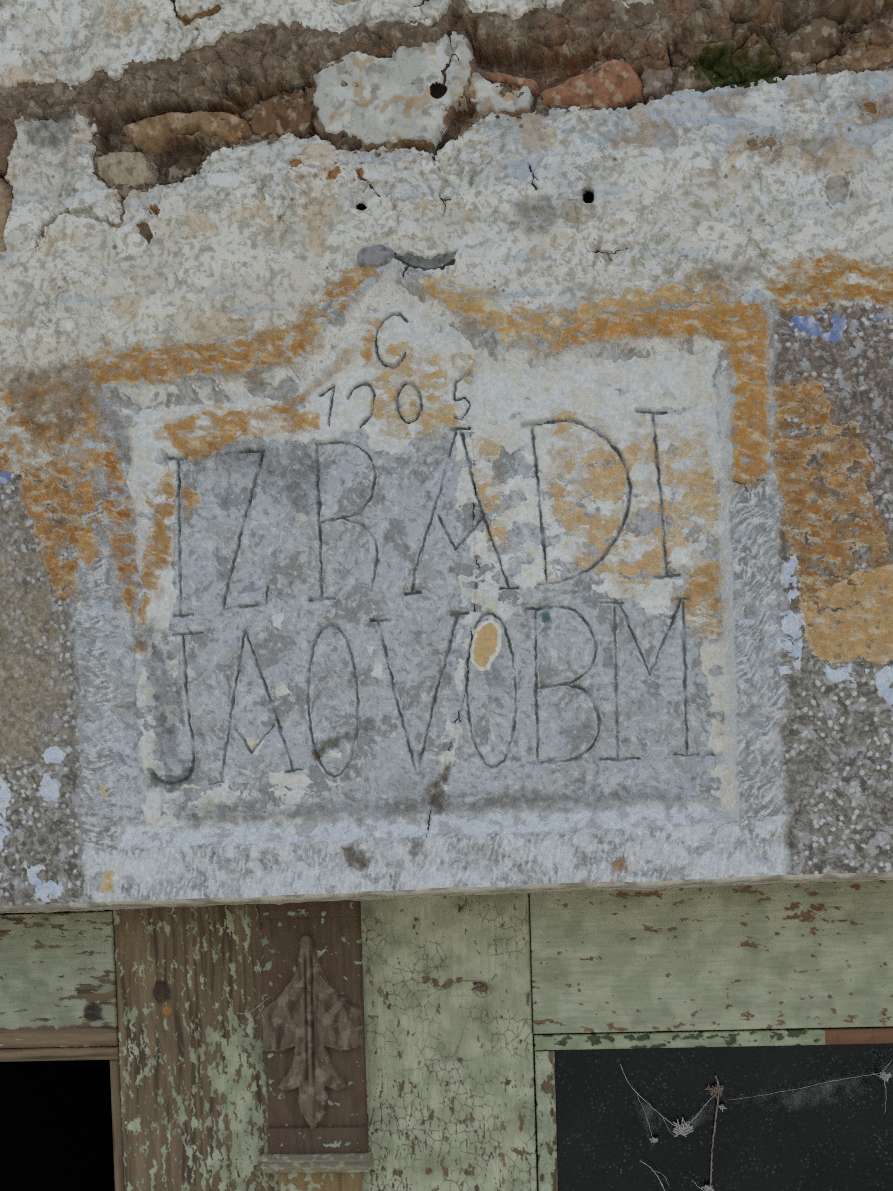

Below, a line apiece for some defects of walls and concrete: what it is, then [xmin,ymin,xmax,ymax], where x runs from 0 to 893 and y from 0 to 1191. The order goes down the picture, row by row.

flaking render [0,0,893,252]
peeling [0,249,893,830]
peeling [0,776,11,850]
peeling [23,864,64,901]
peeling [101,870,115,893]